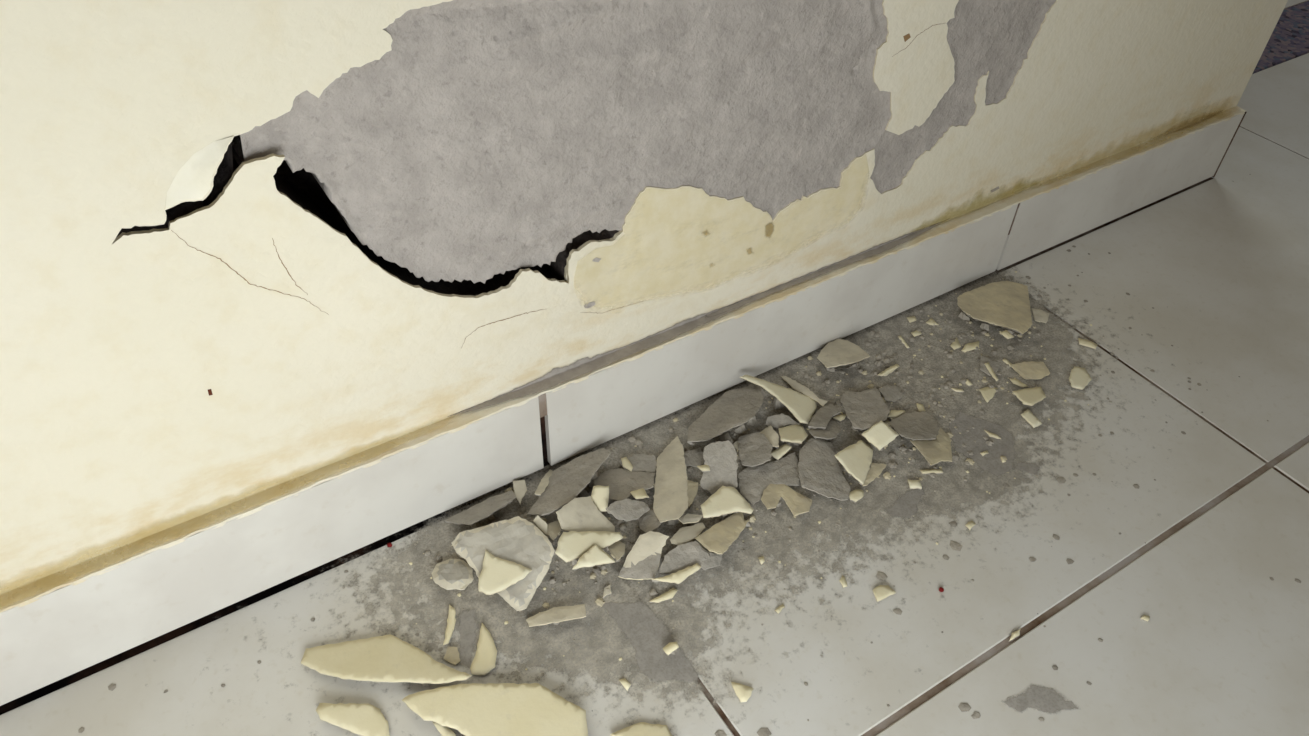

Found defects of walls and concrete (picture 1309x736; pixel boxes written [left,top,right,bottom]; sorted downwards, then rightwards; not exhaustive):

crack [160,142,329,315]
flaking render [165,0,1056,284]
flaking render [957,281,1049,336]